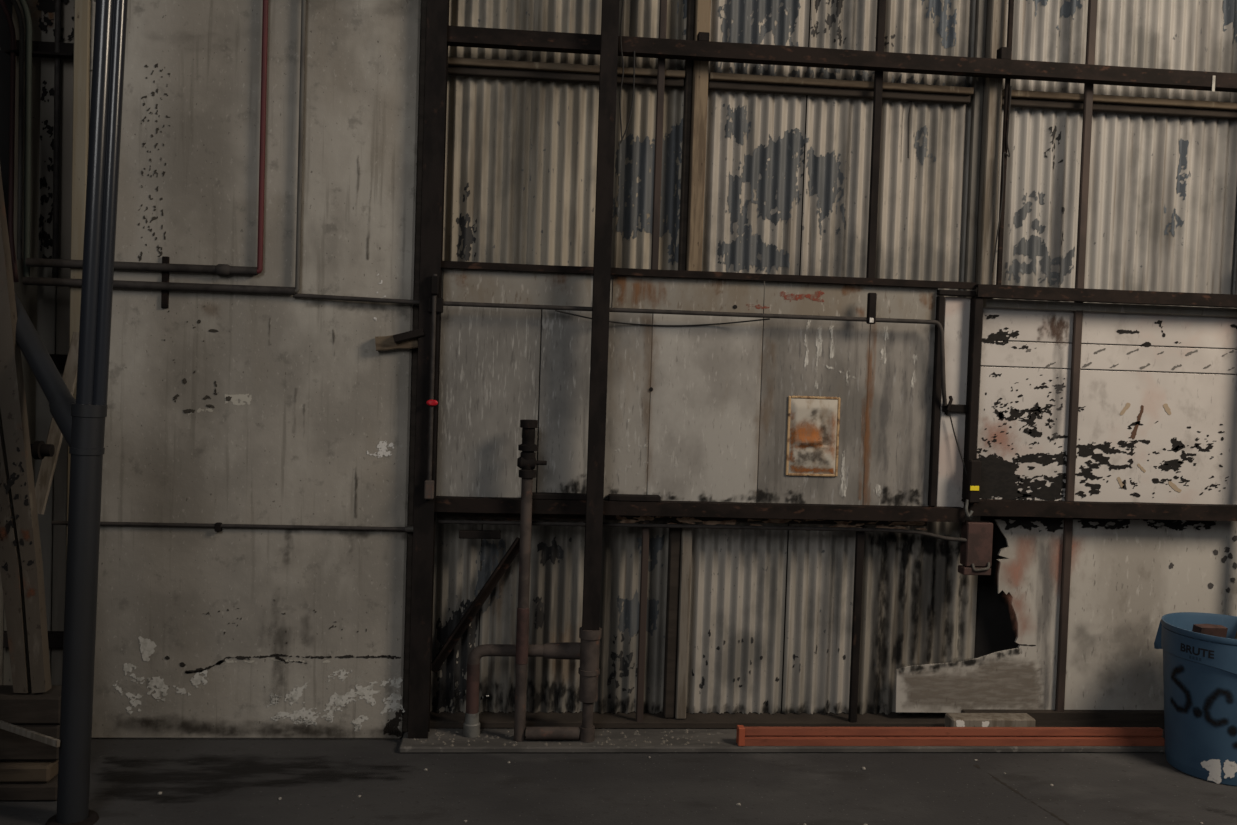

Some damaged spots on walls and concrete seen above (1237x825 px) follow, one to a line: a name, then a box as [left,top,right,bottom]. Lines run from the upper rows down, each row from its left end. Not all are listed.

peeling [718,0,846,46]
peeling [921,0,957,49]
peeling [711,61,874,81]
peeling [613,118,683,265]
peeling [717,104,846,274]
peeling [982,315,1029,349]
peeling [1116,320,1181,347]
peeling [976,377,1229,501]
peeling [1001,516,1216,533]
peeling [113,636,208,714]
crack [165,654,401,674]
peeling [267,669,405,737]